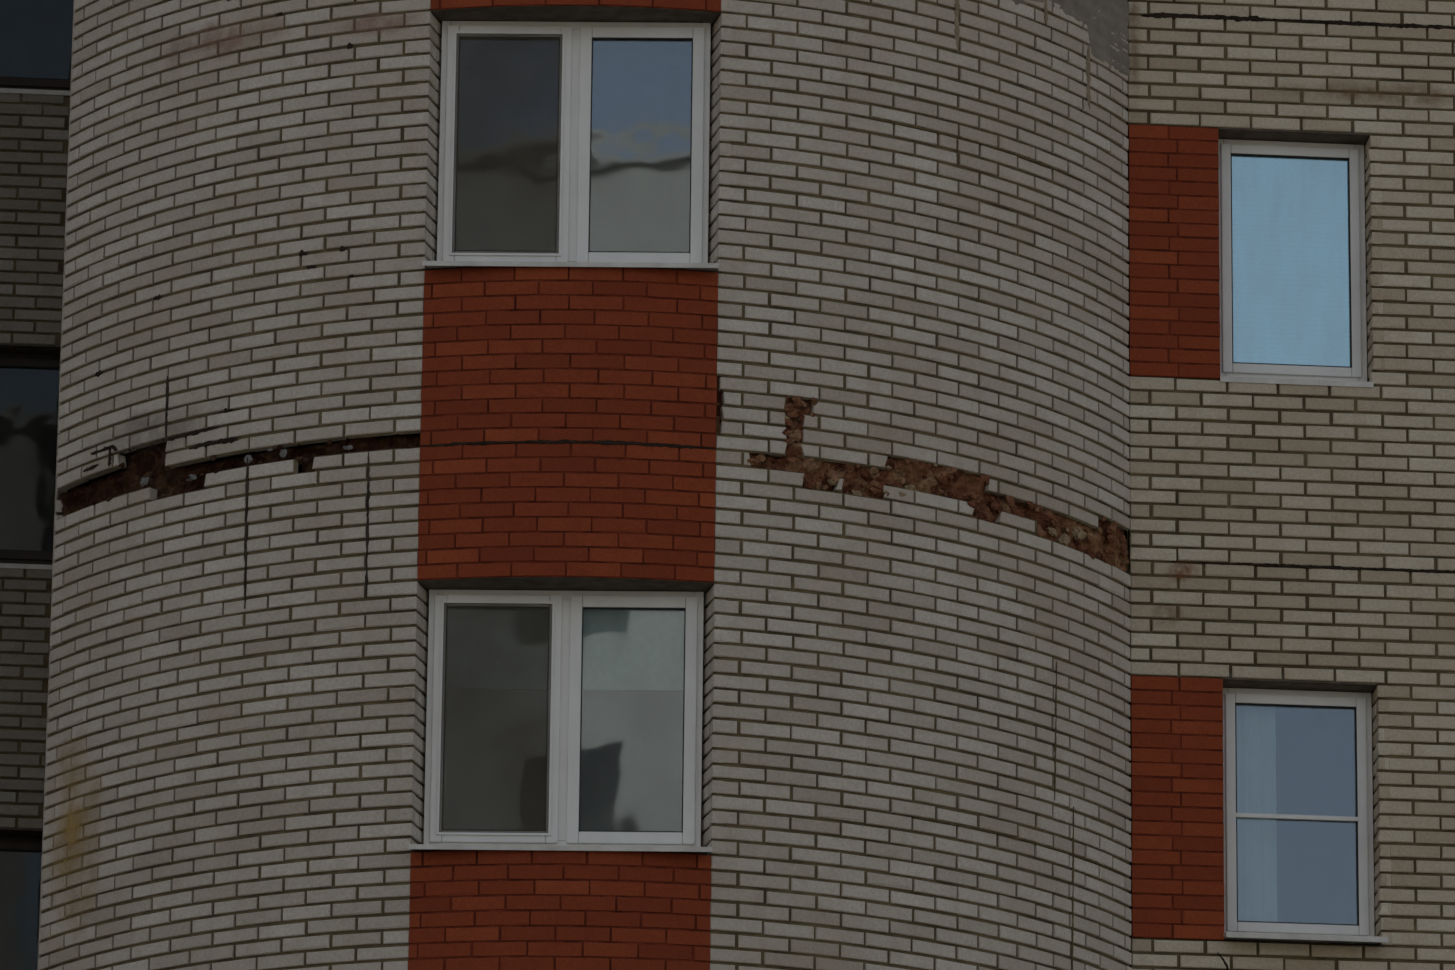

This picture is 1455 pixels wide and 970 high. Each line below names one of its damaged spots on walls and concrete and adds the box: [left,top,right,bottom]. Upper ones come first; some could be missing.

spalling [60,427,420,517]
spalling [747,395,1129,573]